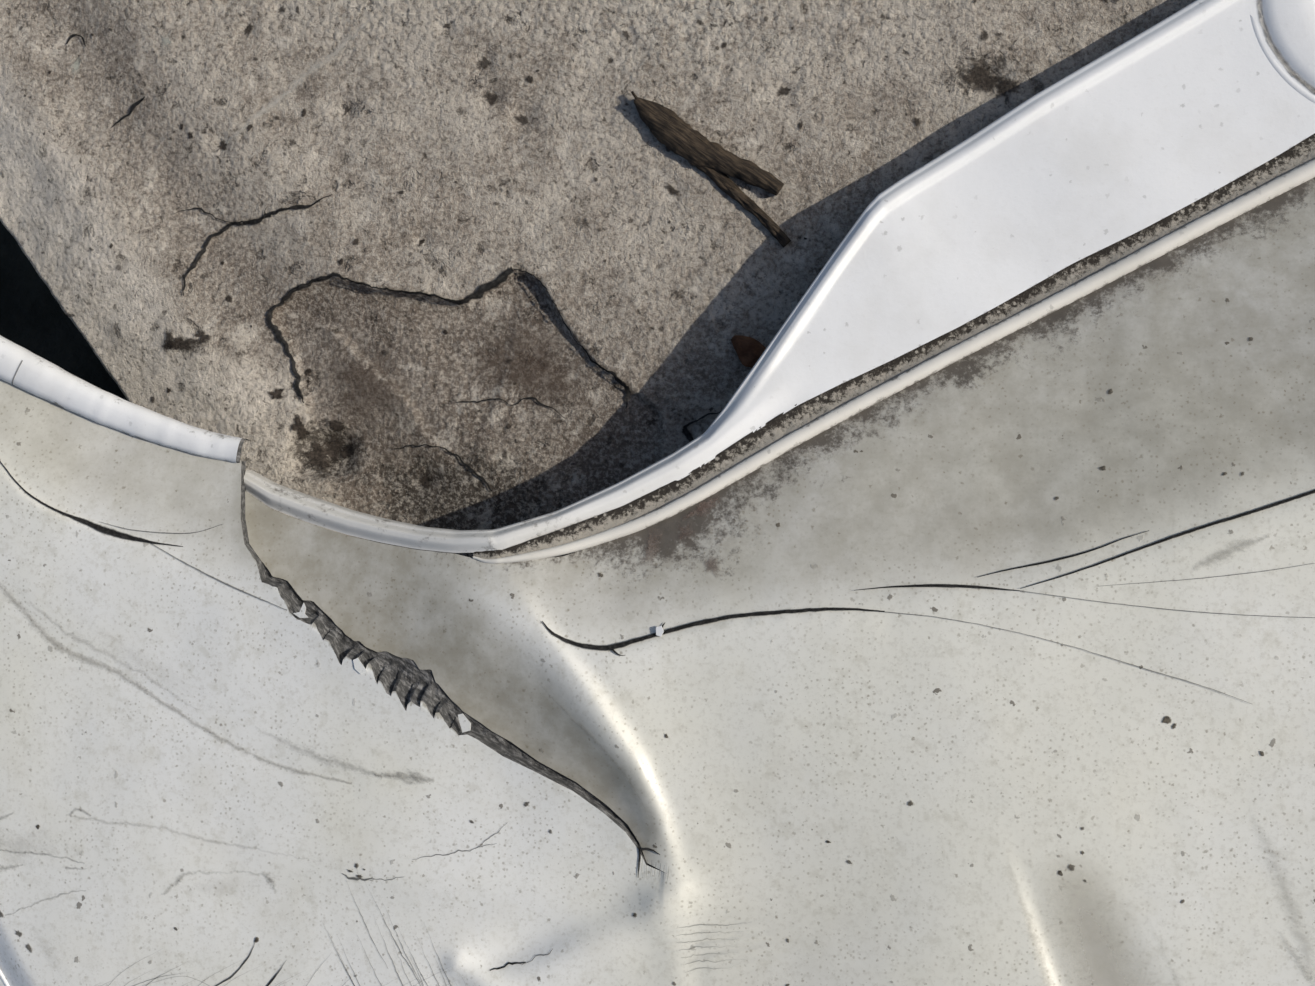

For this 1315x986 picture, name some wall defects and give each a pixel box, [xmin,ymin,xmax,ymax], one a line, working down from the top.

crack [174,194,332,296]
crack [266,267,630,408]
crack [0,461,286,610]
crack [542,490,1315,704]